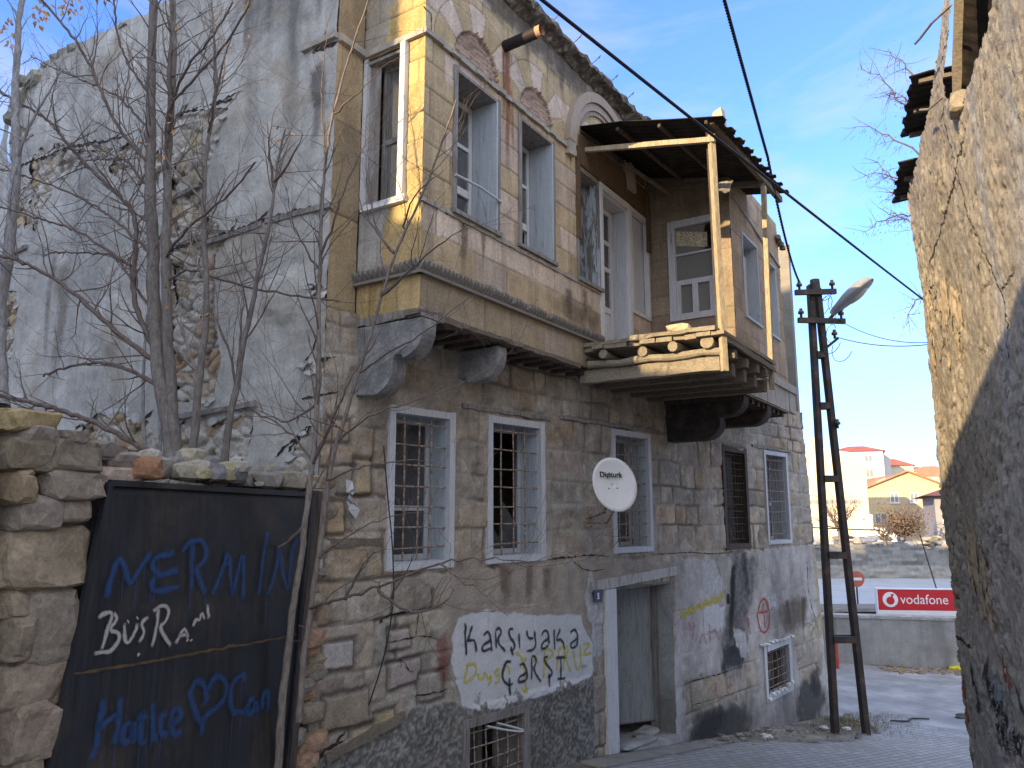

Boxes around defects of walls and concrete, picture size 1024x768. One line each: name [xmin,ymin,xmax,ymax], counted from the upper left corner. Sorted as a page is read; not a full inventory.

corrosion [503,50,514,144]
spalling [4,105,254,462]
crack [928,109,1017,392]
leakage [730,553,748,630]
leakage [797,671,825,722]